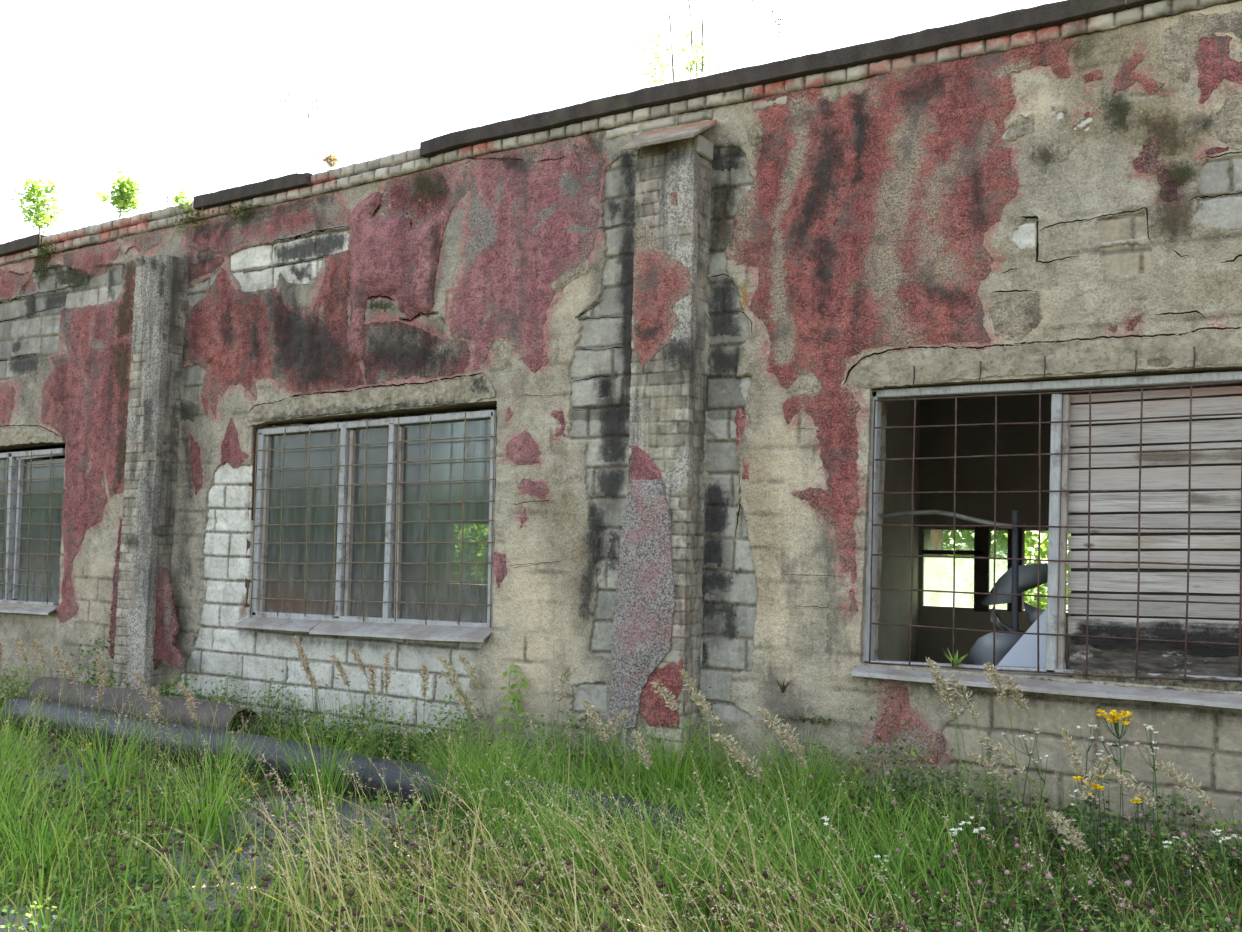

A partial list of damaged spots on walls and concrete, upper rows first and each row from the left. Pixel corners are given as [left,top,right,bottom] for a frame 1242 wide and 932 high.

spalling [153,138,692,735]
leakage [579,148,662,618]
leakage [668,341,690,366]
leakage [708,282,740,375]
peeling [699,11,1242,721]
crack [840,308,1242,388]
leakage [703,485,741,639]